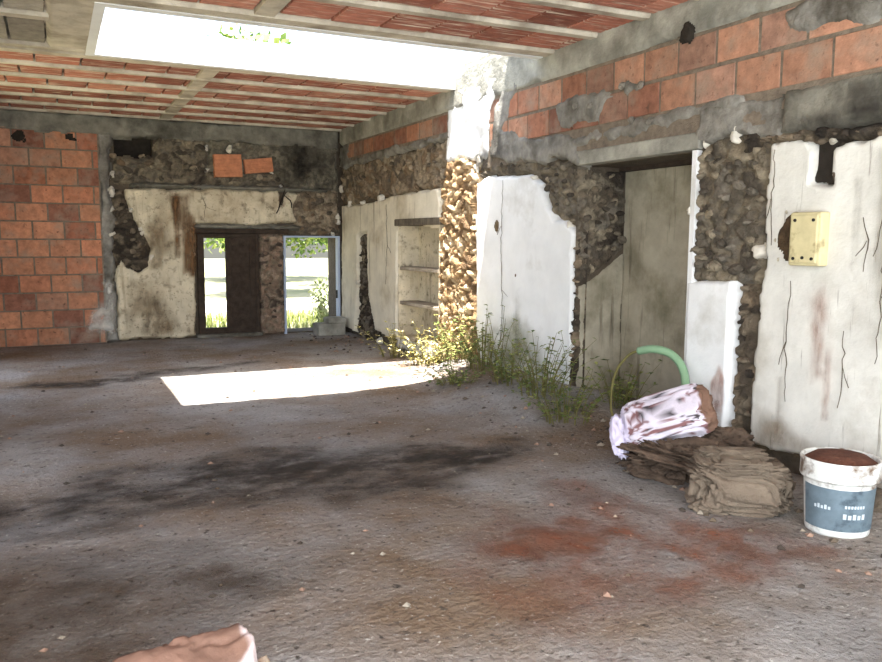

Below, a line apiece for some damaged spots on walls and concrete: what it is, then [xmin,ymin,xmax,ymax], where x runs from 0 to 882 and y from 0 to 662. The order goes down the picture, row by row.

spalling [108,137,627,387]
spalling [686,123,882,434]
crack [837,331,849,408]
crack [856,217,882,364]